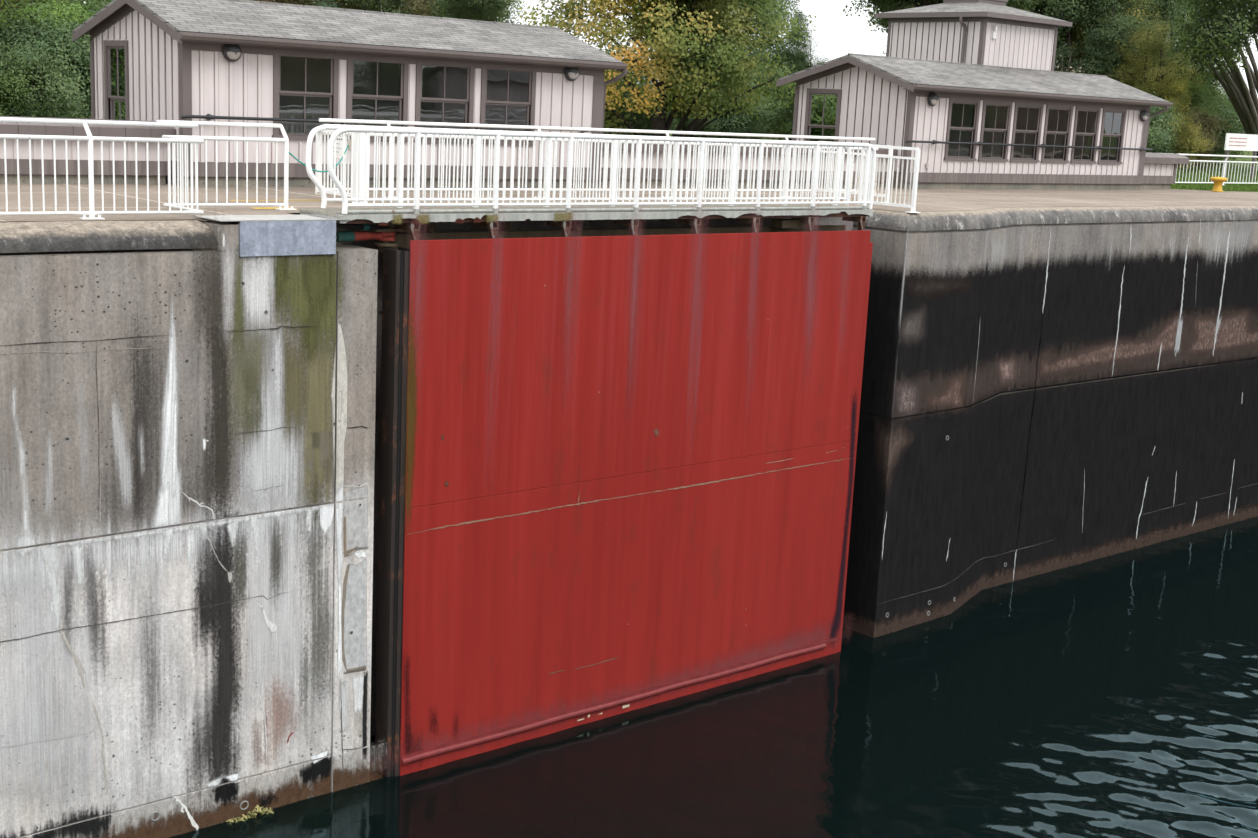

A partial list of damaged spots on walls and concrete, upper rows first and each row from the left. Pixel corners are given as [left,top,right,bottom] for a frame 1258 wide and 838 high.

leakage [0,233,380,838]
leakage [830,220,1258,639]
rust [843,505,1258,638]
rust [99,762,383,838]